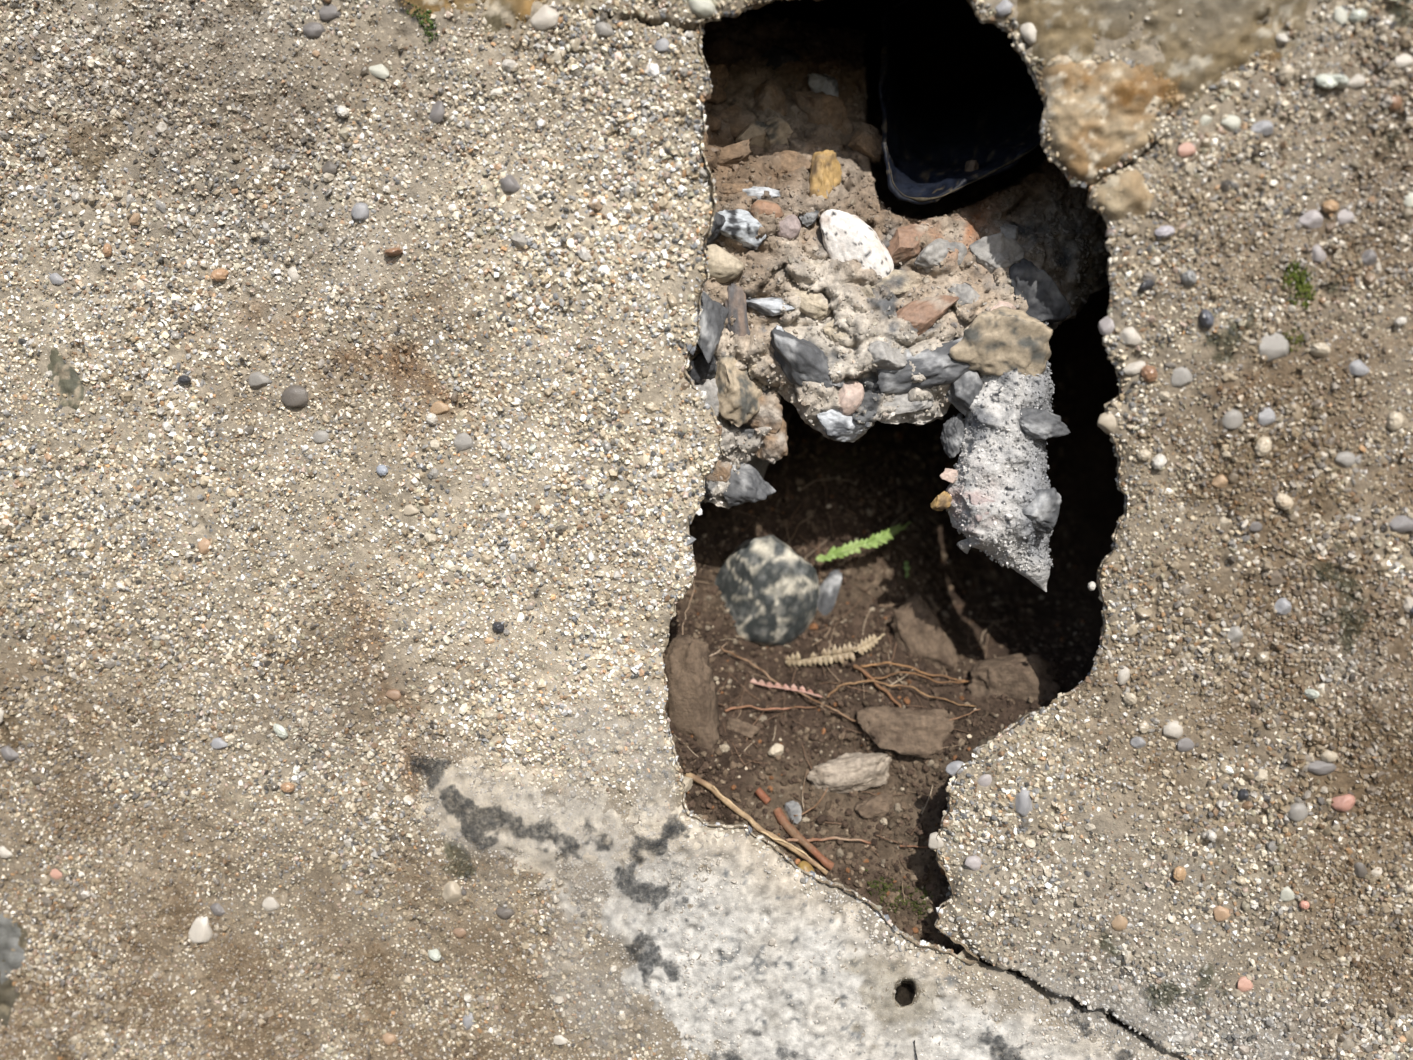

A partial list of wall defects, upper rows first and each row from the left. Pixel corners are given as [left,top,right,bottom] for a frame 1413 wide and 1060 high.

spalling [659,0,1171,965]
crack [979,957,1151,1041]